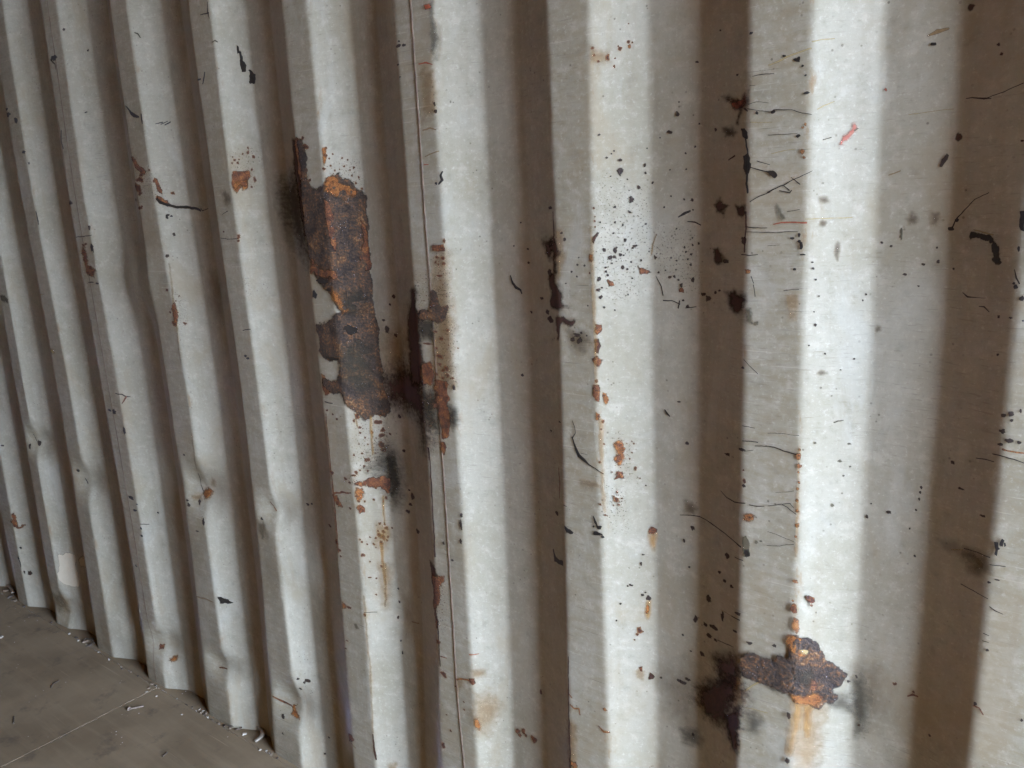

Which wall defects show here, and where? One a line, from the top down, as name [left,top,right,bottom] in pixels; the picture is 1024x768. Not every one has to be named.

rust [231,147,256,192]
rust [540,150,758,430]
rust [294,136,476,688]
peeling [57,553,86,587]
rust [696,595,858,754]